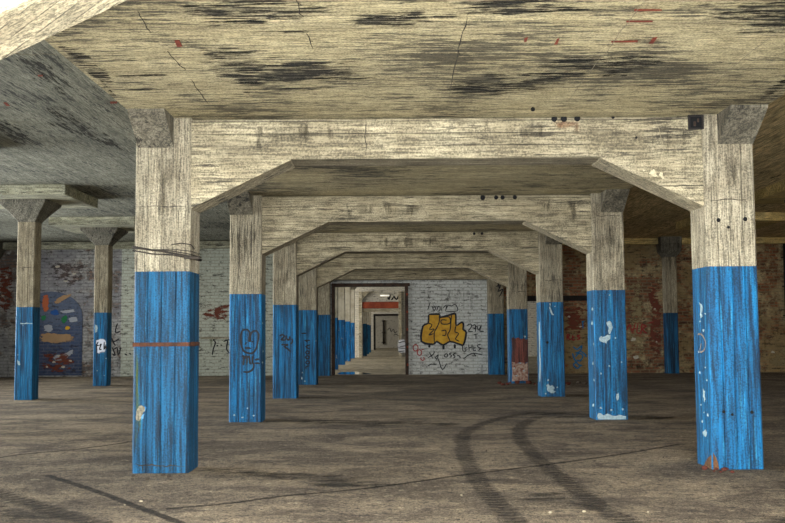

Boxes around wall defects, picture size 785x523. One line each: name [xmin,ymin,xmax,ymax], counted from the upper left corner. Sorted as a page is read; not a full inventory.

leakage [179,0,334,33]
leakage [344,0,618,27]
leakage [201,42,365,93]
leakage [428,55,662,97]
peeling [593,321,616,345]
flaking render [628,278,662,364]
peeling [512,336,528,381]
peeling [539,322,558,394]
peeling [592,393,626,419]